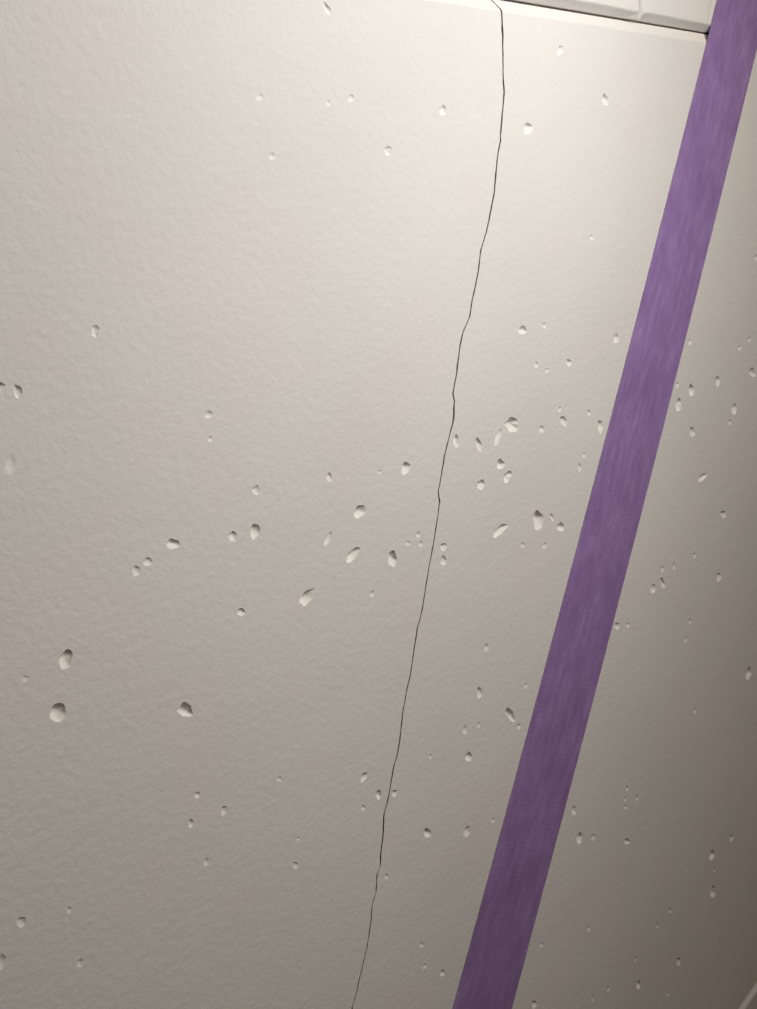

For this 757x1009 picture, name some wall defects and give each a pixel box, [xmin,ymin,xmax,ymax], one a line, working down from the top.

crack [352,0,505,1009]